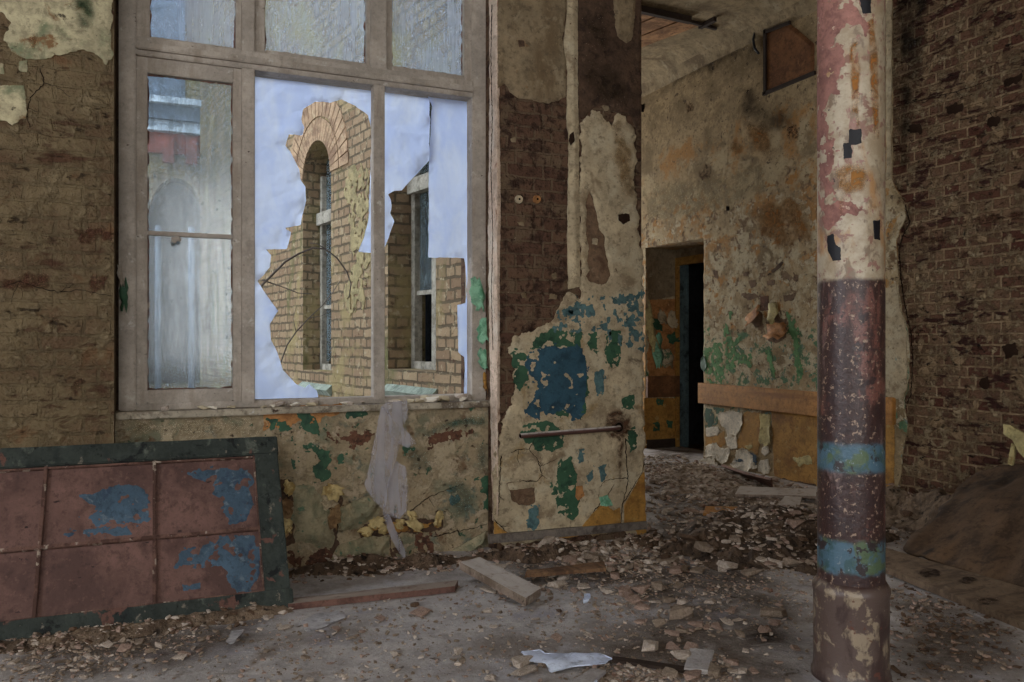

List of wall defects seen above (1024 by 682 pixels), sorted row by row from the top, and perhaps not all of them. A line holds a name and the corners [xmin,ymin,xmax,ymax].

crack [27,70,70,127]
peeling [817,0,872,261]
peeling [703,261,805,384]
peeling [506,192,680,545]
peeling [263,403,375,568]
spalling [357,489,460,557]
spalling [402,427,474,456]
peeling [474,476,488,511]
crack [593,438,644,520]
peeling [699,407,817,486]
peeling [886,424,895,487]